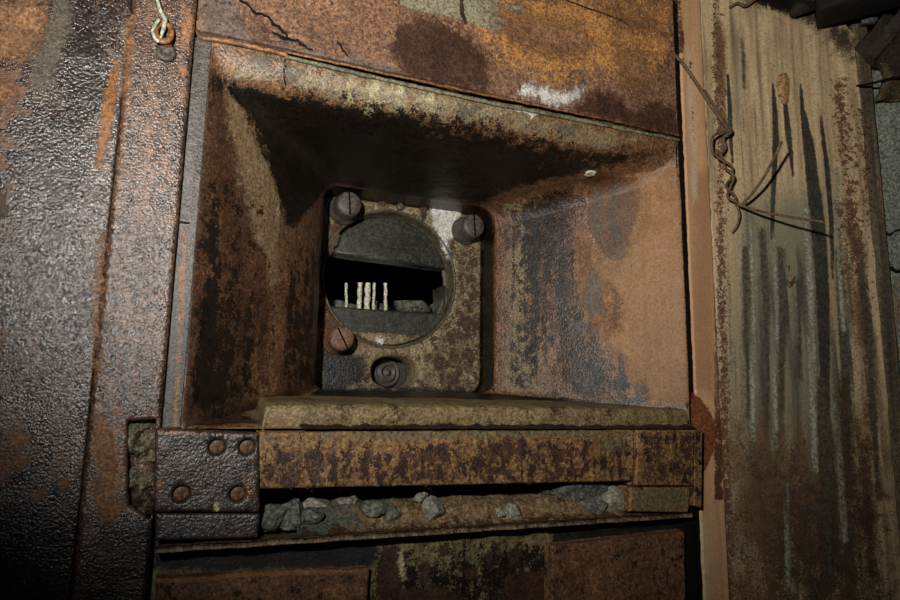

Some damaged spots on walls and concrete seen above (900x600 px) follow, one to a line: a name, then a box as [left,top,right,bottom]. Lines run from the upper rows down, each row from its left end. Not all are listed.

corrosion [0,0,50,63]
corrosion [95,15,139,168]
corrosion [183,71,358,427]
crack [239,0,313,86]
corrosion [239,0,490,95]
corrosion [486,0,736,600]
damp [726,74,734,164]
corrosion [756,0,798,13]
damp [742,83,854,581]
corrosion [830,77,875,291]
damp [856,242,882,500]
corrosion [157,535,545,600]